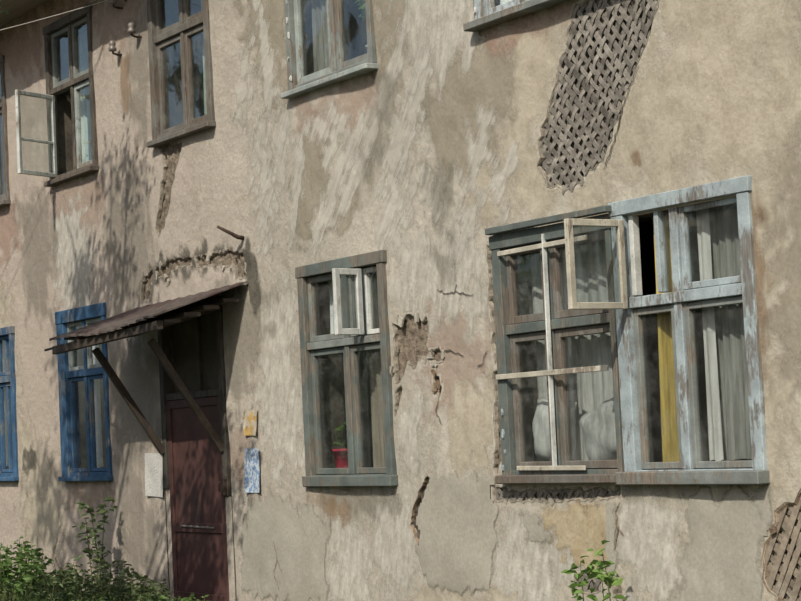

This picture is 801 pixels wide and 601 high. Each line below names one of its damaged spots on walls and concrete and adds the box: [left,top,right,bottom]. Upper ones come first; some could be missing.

spalling [537,0,659,195]
spalling [155,142,182,237]
leakage [136,0,518,314]
spalling [141,249,247,303]
spalling [389,311,445,416]
spalling [486,245,506,474]
spalling [492,485,621,506]
spalling [762,488,801,601]